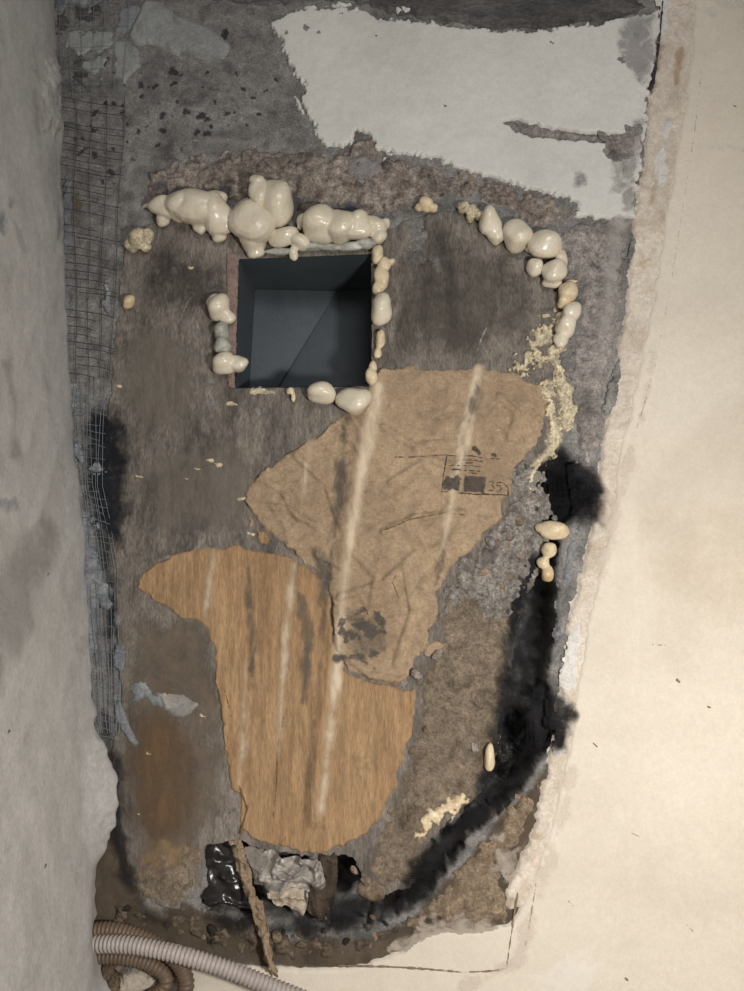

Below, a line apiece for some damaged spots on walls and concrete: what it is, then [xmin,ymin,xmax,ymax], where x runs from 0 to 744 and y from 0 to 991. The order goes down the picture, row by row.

spalling [75,100,148,159]
damp [86,410,128,637]
flaking render [108,0,694,960]
damp [94,593,548,970]